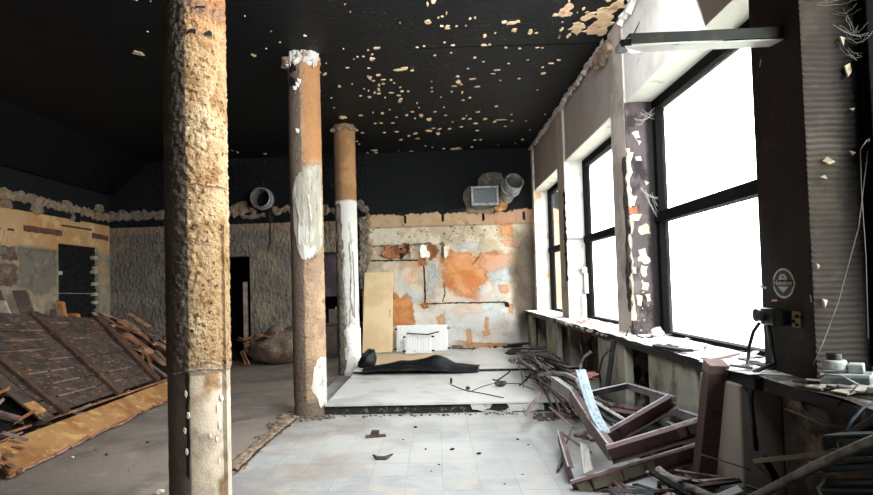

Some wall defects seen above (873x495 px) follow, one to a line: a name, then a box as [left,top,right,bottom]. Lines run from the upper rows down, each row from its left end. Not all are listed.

peeling [481,20,520,46]
spalling [281,49,327,90]
spalling [330,97,378,154]
peeling [346,47,513,152]
peeling [515,0,637,151]
flaking render [0,187,165,223]
flaking render [622,131,651,321]
flaking render [0,246,18,287]
peeling [228,164,512,374]
peeling [311,356,327,408]